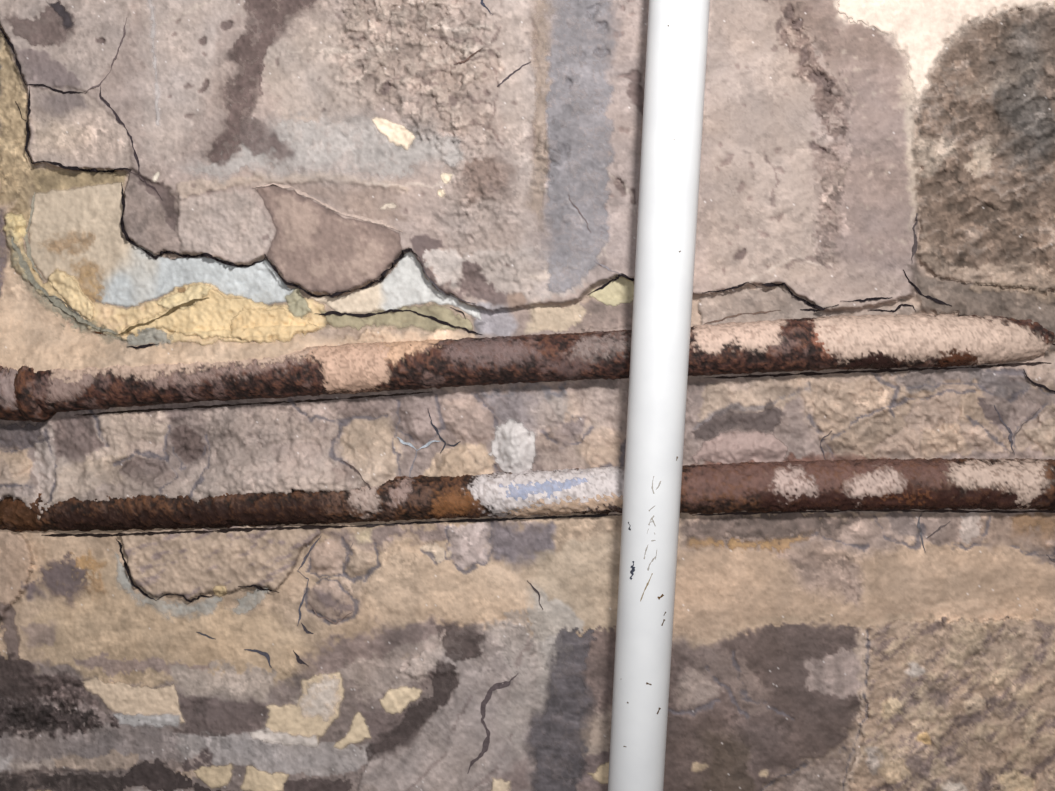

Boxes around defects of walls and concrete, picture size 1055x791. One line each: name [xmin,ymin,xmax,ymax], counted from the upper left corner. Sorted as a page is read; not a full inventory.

water stain [196,0,463,177]
crack [497,61,531,87]
crack [0,18,482,335]
water stain [530,0,613,292]
spalling [3,183,481,346]
peeling [590,276,634,306]
corrosion [432,487,479,518]
corrosion [685,511,859,552]
corrosion [688,453,953,509]
corrosion [1012,515,1055,531]
crack [45,514,622,668]
crack [467,673,518,774]